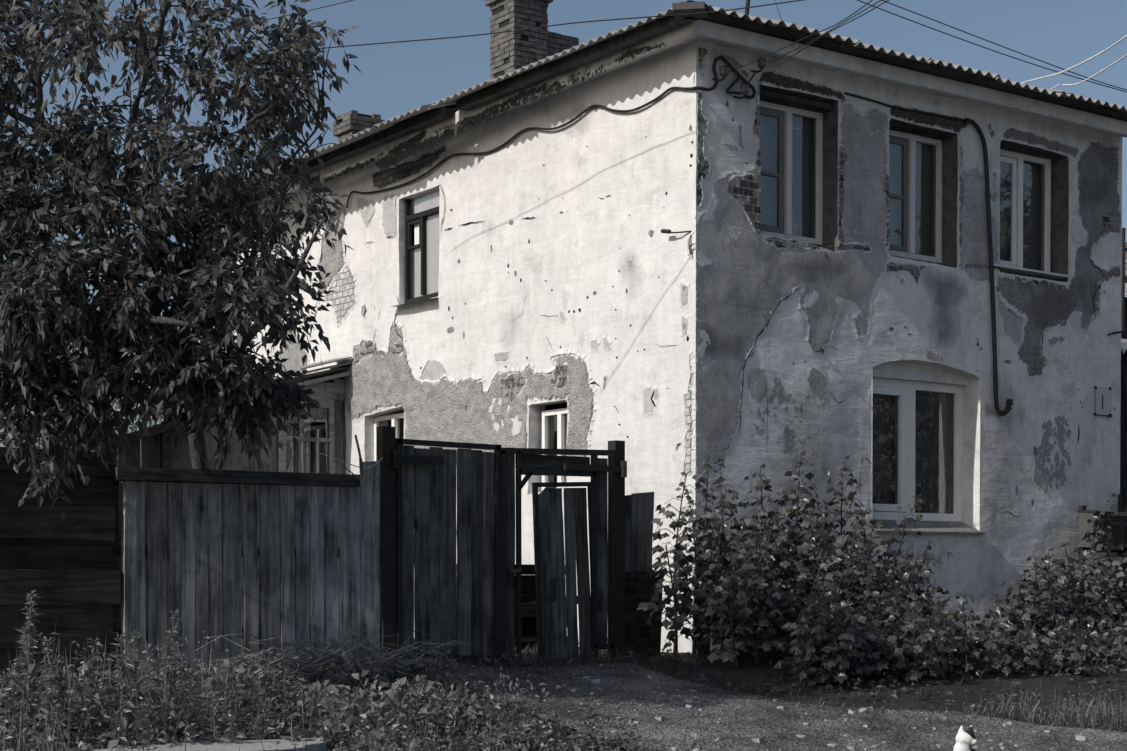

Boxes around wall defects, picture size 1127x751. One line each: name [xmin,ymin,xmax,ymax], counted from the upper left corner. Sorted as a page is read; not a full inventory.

flaking render [697,43,715,76]
peeling [299,42,668,467]
peeling [678,66,971,482]
peeling [956,122,1121,382]
peeling [1030,389,1083,506]